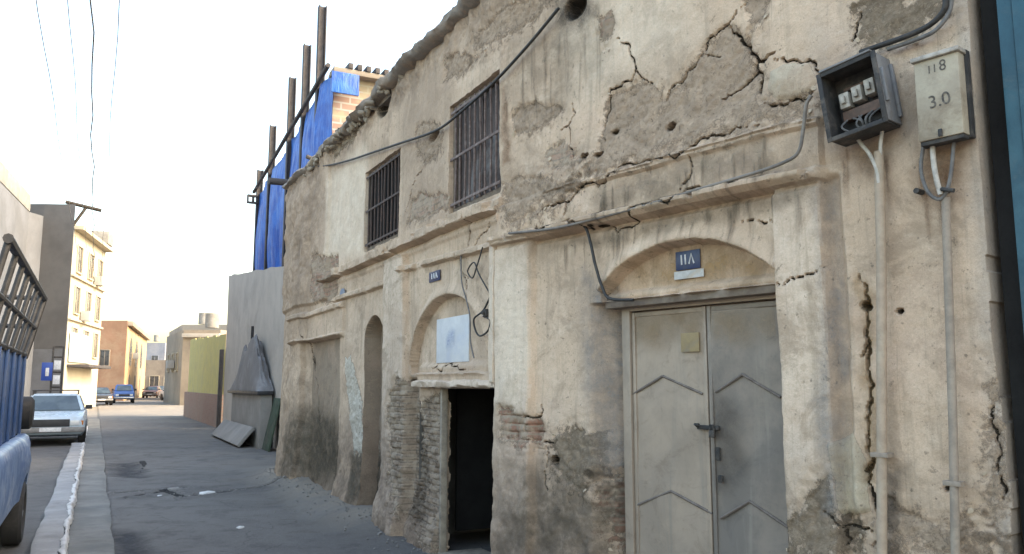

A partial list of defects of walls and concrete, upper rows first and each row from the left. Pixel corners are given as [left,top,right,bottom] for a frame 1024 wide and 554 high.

spalling [847,0,951,54]
spalling [497,0,822,232]
crack [535,16,819,233]
water stain [282,415,338,479]
peeling [345,354,363,457]
spalling [379,377,440,554]
spalling [499,407,626,554]
crack [828,276,877,544]
crack [990,407,1008,498]